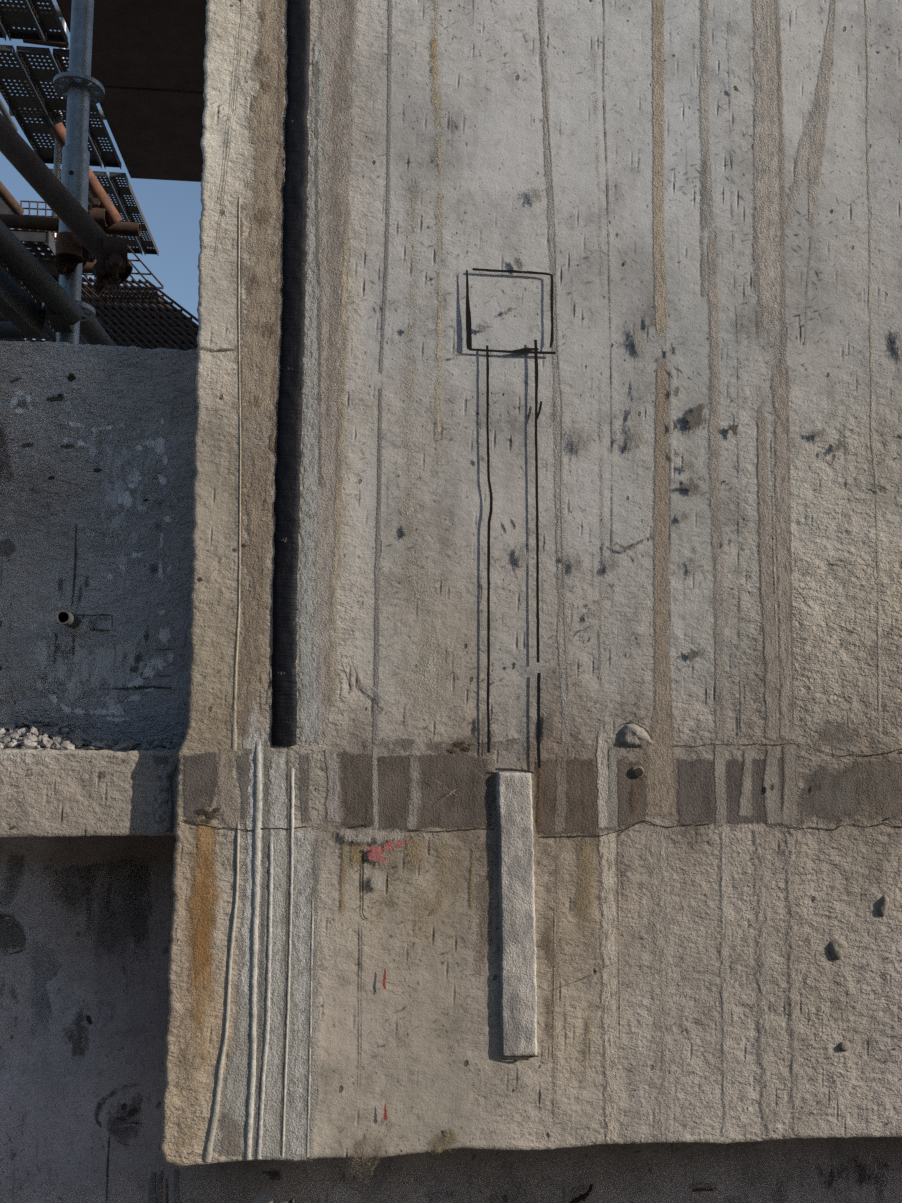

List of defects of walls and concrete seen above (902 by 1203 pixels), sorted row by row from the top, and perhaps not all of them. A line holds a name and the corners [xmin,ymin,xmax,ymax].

crack [495,767,534,775]
crack [540,820,711,838]
crack [776,818,902,830]
water stain [40,858,153,977]
water stain [0,916,116,1057]
rust [170,823,222,1150]